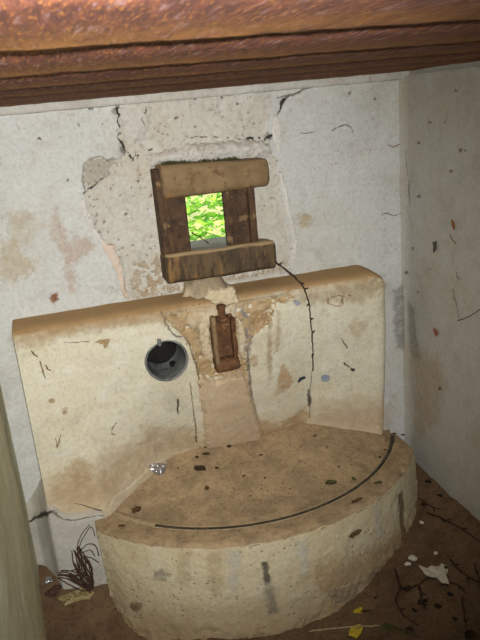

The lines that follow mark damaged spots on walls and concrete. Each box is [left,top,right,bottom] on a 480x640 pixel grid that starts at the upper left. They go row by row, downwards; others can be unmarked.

crack [277,88,310,115]
crack [116,107,153,160]
crack [183,133,272,141]
flaking render [81,93,299,378]
crack [28,503,104,522]